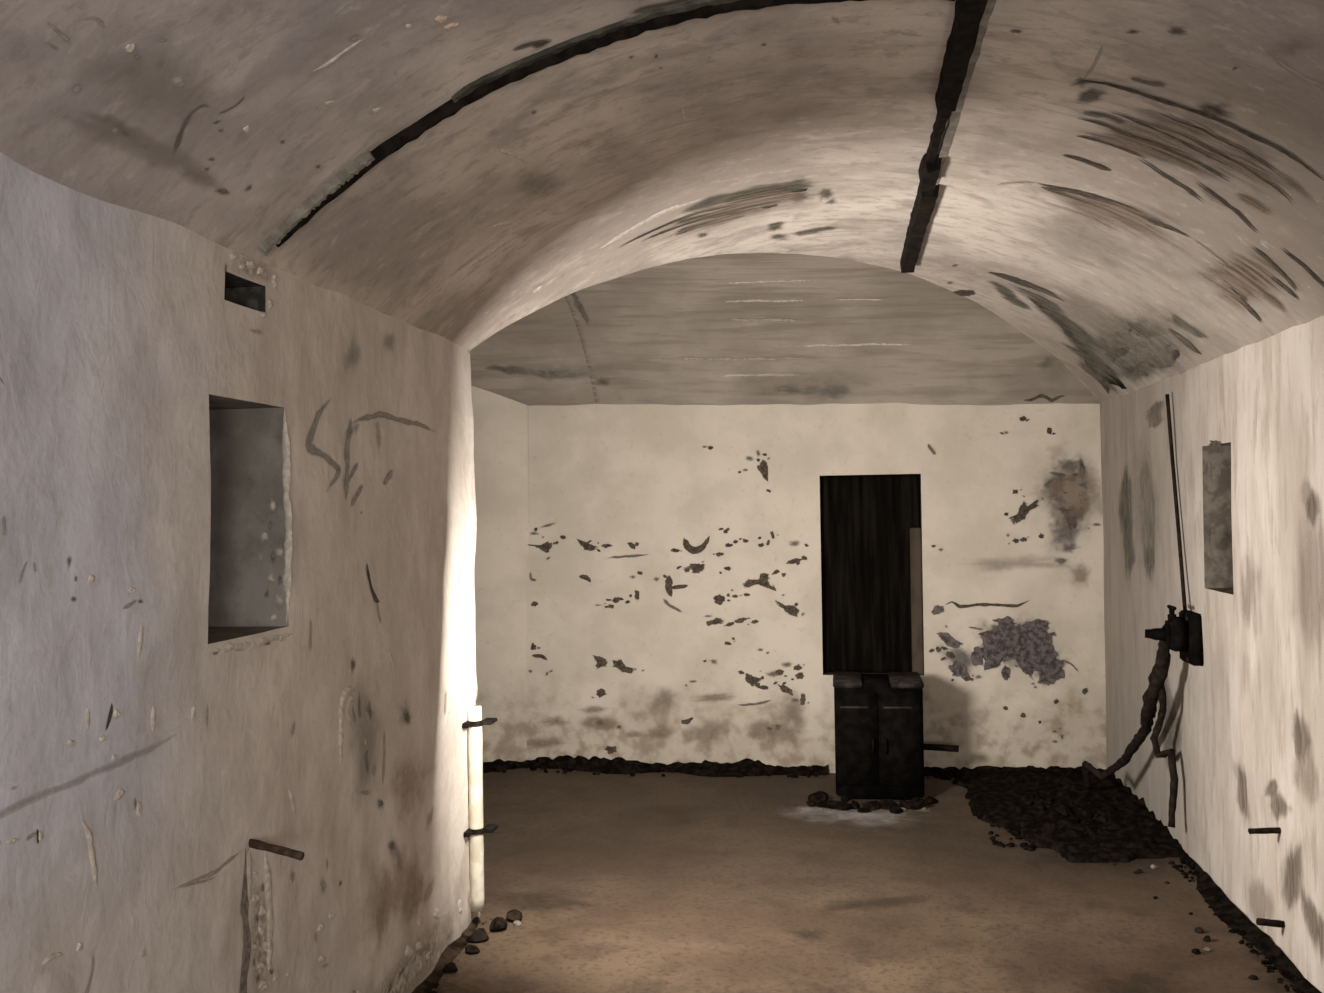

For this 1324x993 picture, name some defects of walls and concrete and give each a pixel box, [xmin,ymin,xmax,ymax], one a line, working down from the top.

leakage [621,181,835,251]
leakage [1077,111,1306,323]
leakage [988,272,1206,394]
peeling [738,451,771,493]
leakage [1119,465,1154,575]
peeling [528,524,808,645]
peeling [592,655,644,673]
peeling [738,663,809,706]
peeling [929,600,1078,704]
leakage [1268,780,1287,819]
spalling [240,850,291,993]
leakage [1284,848,1323,955]